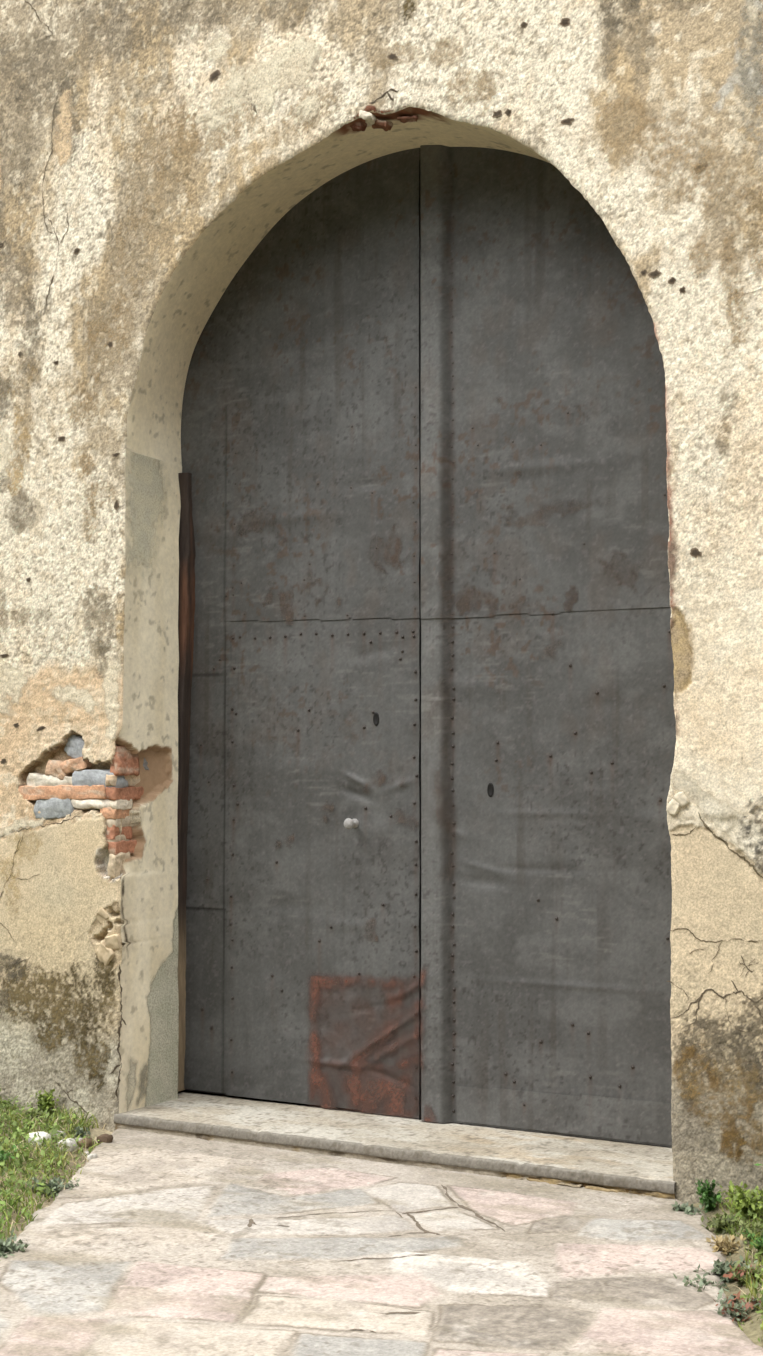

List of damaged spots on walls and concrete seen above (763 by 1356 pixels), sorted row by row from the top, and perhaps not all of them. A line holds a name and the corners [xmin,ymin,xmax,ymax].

water stain [602,0,654,78]
water stain [599,94,763,343]
water stain [0,95,39,531]
water stain [79,454,113,542]
flaking render [0,654,149,880]
water stain [0,954,28,1021]
crack [0,816,79,967]
flaking render [89,902,125,969]
crack [667,928,763,1033]
peeling [670,770,763,873]
crack [673,812,763,878]
water stain [673,990,763,1105]